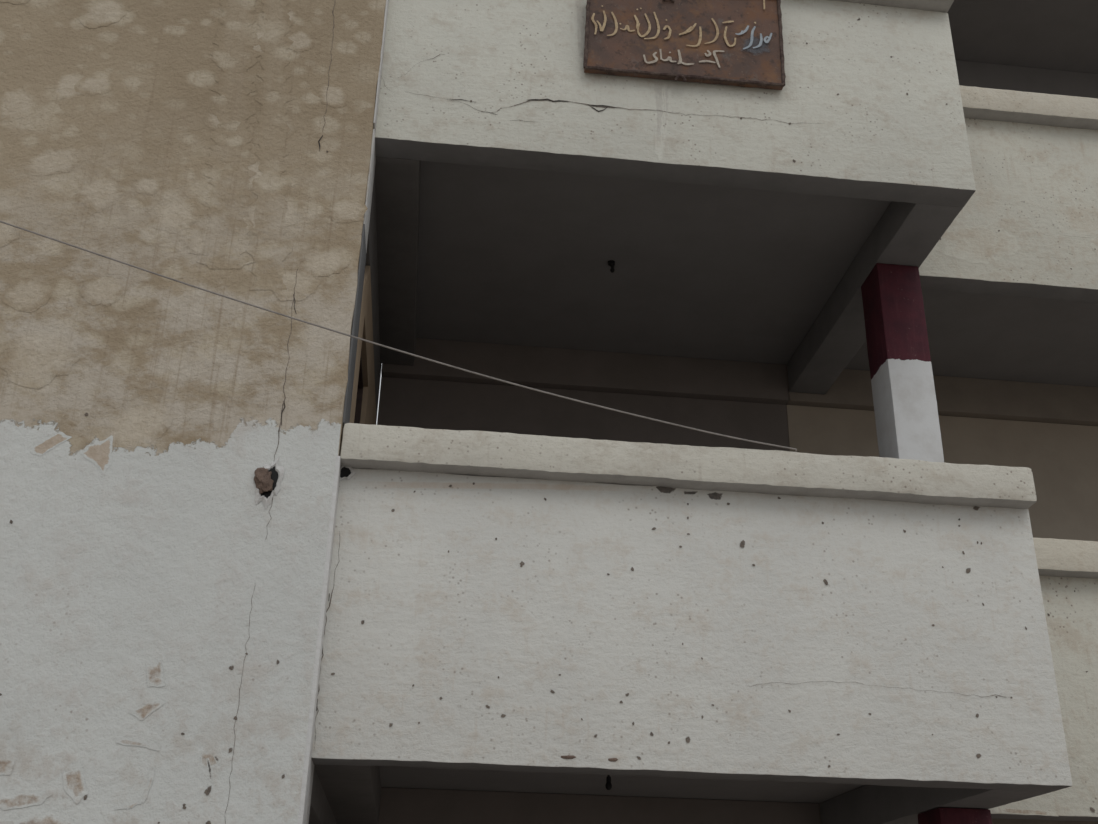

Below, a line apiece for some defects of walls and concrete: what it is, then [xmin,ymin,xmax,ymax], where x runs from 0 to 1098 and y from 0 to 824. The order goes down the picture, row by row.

crack [381,54,794,124]
crack [274,269,298,459]
peeling [30,432,72,456]
peeling [80,435,113,475]
spalling [261,467,278,498]